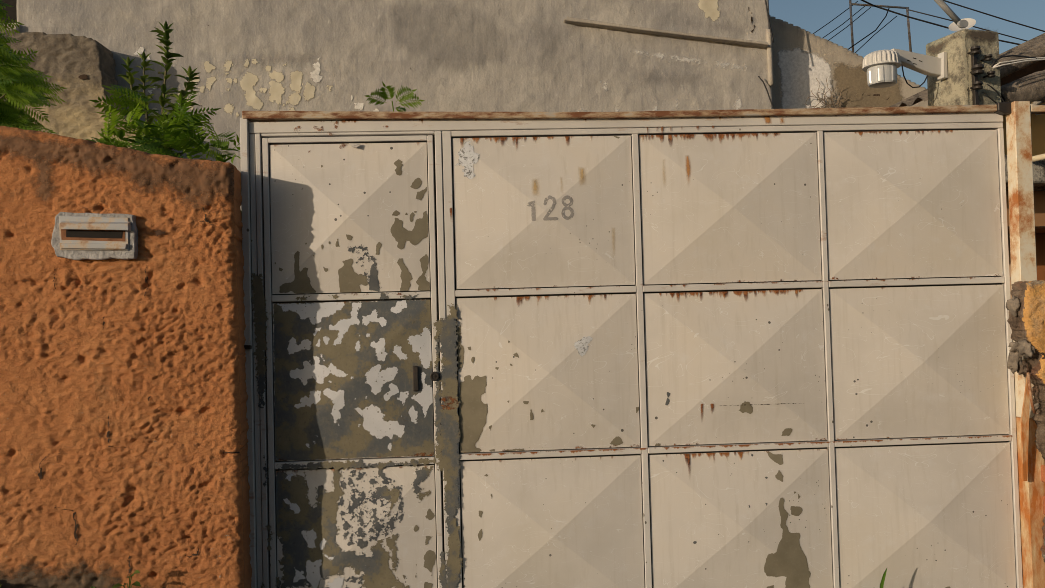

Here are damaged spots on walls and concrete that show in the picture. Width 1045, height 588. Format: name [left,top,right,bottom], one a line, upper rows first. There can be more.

flaking render [187,57,333,117]
corrosion [460,136,572,146]
water stain [0,130,234,209]
peeling [251,178,524,588]
corrosion [464,445,646,461]
peeling [765,452,783,482]
corrosion [663,437,943,469]
peeling [764,492,811,588]
water stain [0,562,121,588]